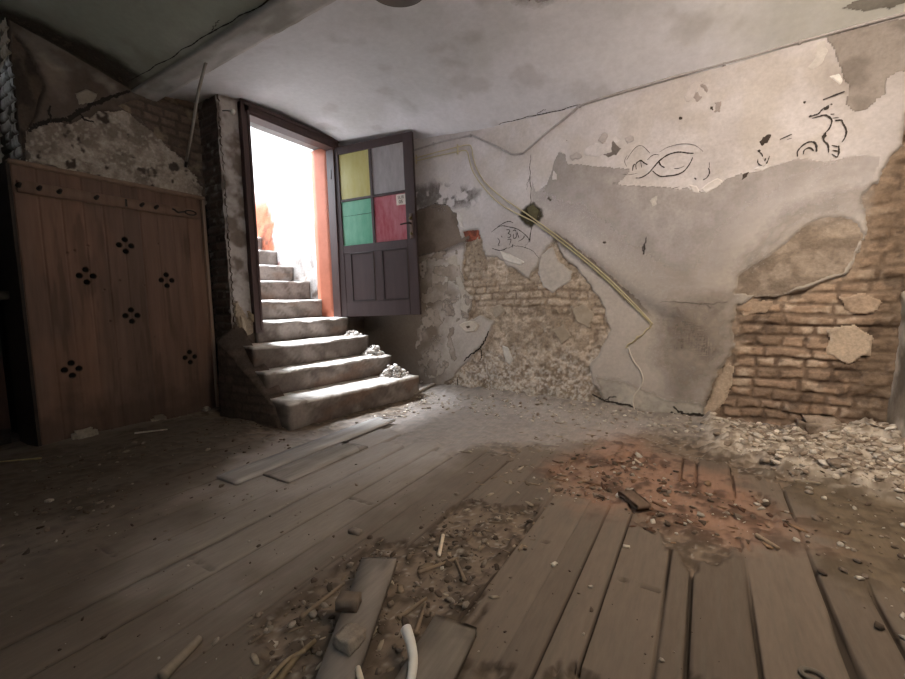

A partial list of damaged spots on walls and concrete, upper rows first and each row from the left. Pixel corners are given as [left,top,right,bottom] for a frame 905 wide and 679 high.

flaking render [10,36,205,196]
crack [28,0,269,132]
peeling [807,19,905,111]
peeling [844,0,905,11]
flaking render [415,204,611,403]
flaking render [703,131,905,426]